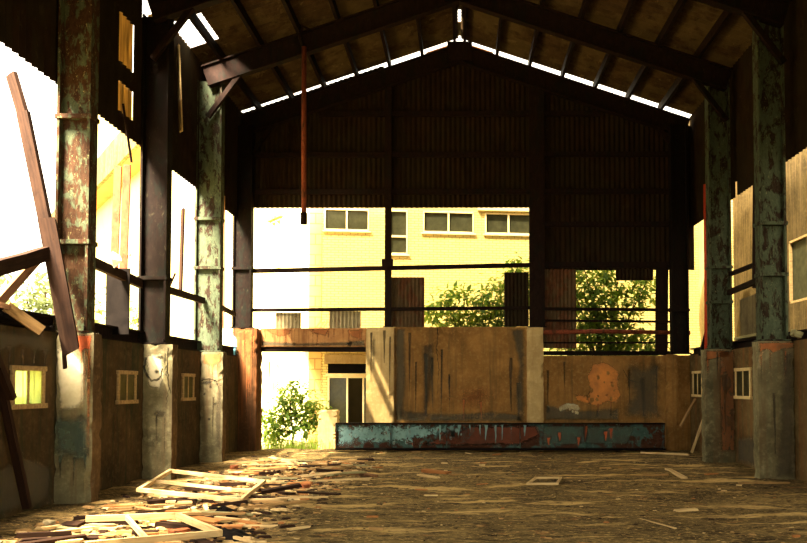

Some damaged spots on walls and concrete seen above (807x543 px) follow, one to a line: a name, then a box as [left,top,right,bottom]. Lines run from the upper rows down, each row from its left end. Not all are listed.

flaking render [58,351,84,408]
leakage [262,329,524,421]
peeling [559,363,622,415]
peeling [337,424,467,446]